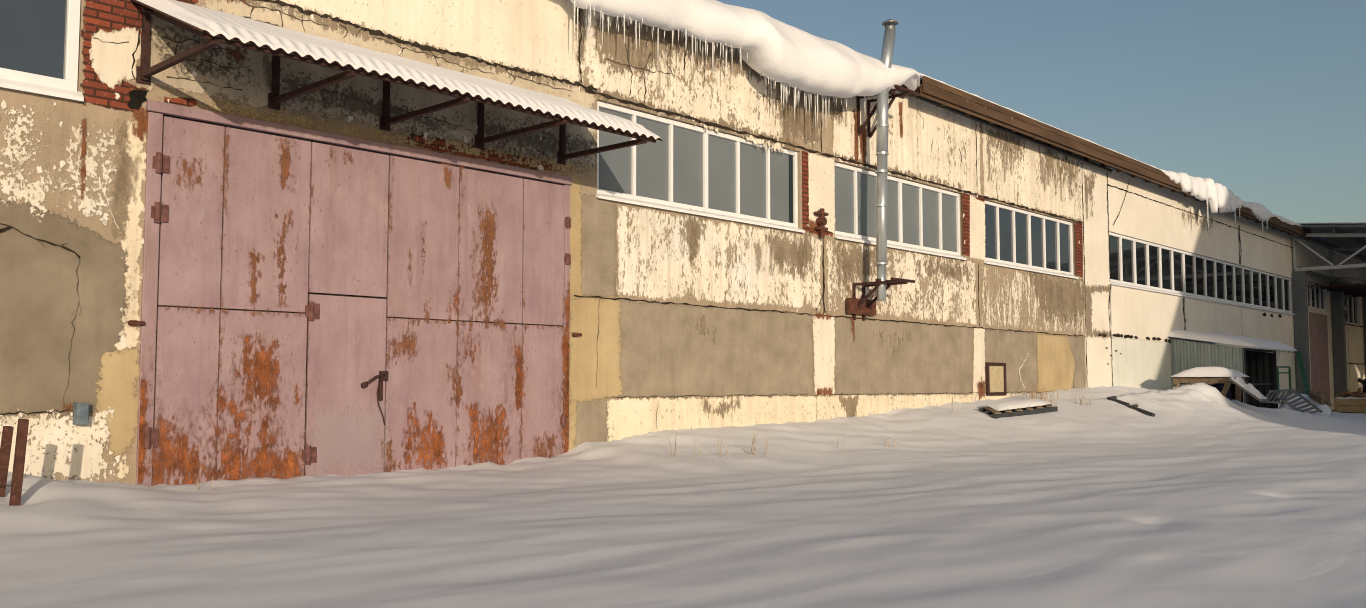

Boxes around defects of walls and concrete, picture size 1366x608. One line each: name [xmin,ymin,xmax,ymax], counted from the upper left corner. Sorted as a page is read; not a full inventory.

leakage [245,0,848,151]
crack [0,223,81,415]
peeling [0,404,129,483]
corrosion [137,300,308,485]
corrosion [246,164,314,345]
corrosion [281,139,290,189]
corrosion [381,206,570,472]
peeling [0,0,1171,365]
leakage [681,209,710,270]
leakage [755,229,815,282]
leakage [918,256,973,284]
leakage [986,128,1097,217]